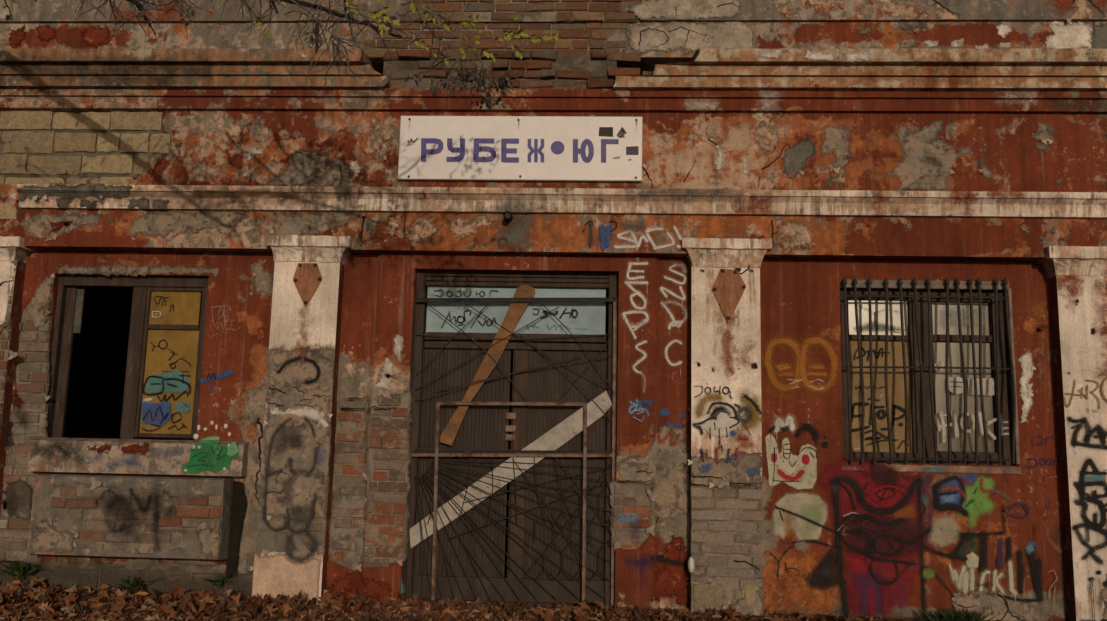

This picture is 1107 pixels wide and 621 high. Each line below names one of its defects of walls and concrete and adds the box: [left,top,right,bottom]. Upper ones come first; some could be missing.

spalling [358,0,781,89]
crack [638,8,708,47]
peeling [804,50,869,63]
peeling [856,0,958,49]
peeling [951,24,1012,49]
peeling [1045,0,1107,49]
spalling [0,111,250,241]
spalling [752,91,854,187]
spalling [888,120,994,191]
peeling [1019,351,1044,423]
peeling [0,258,413,601]
spalling [609,425,764,616]